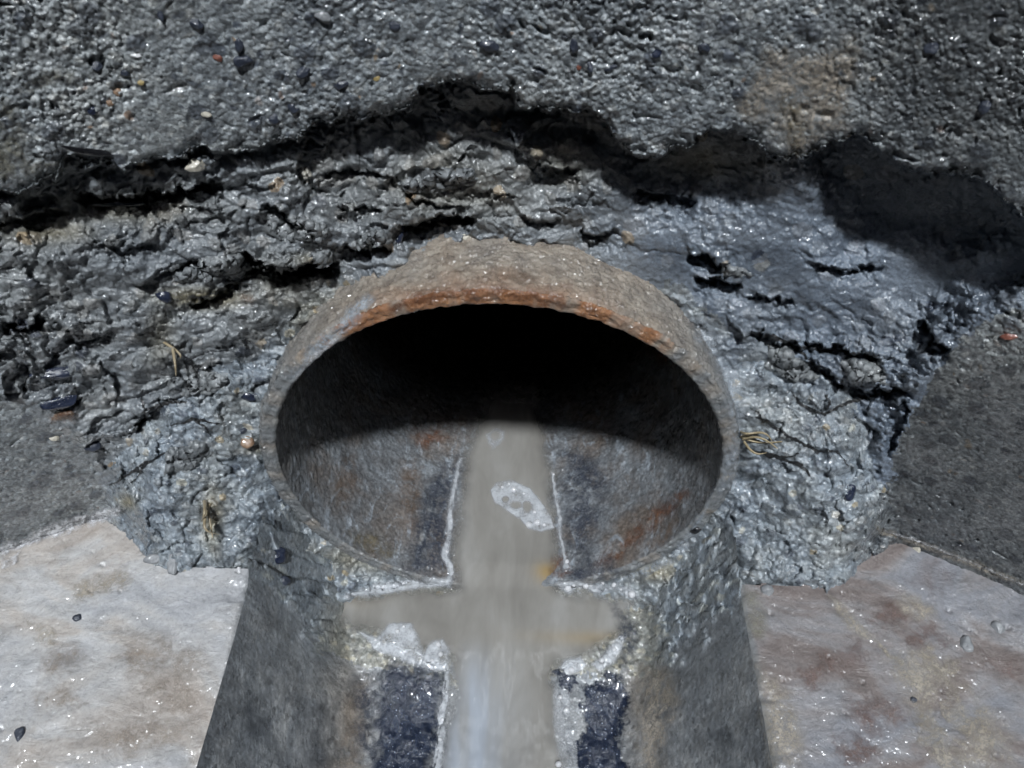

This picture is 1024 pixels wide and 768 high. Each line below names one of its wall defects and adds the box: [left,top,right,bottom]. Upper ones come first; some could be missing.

spalling [0,79,1024,507]
crack [748,332,910,416]
crack [740,408,849,479]
leakage [413,480,451,569]
leakage [567,454,604,549]
leakage [552,669,578,694]